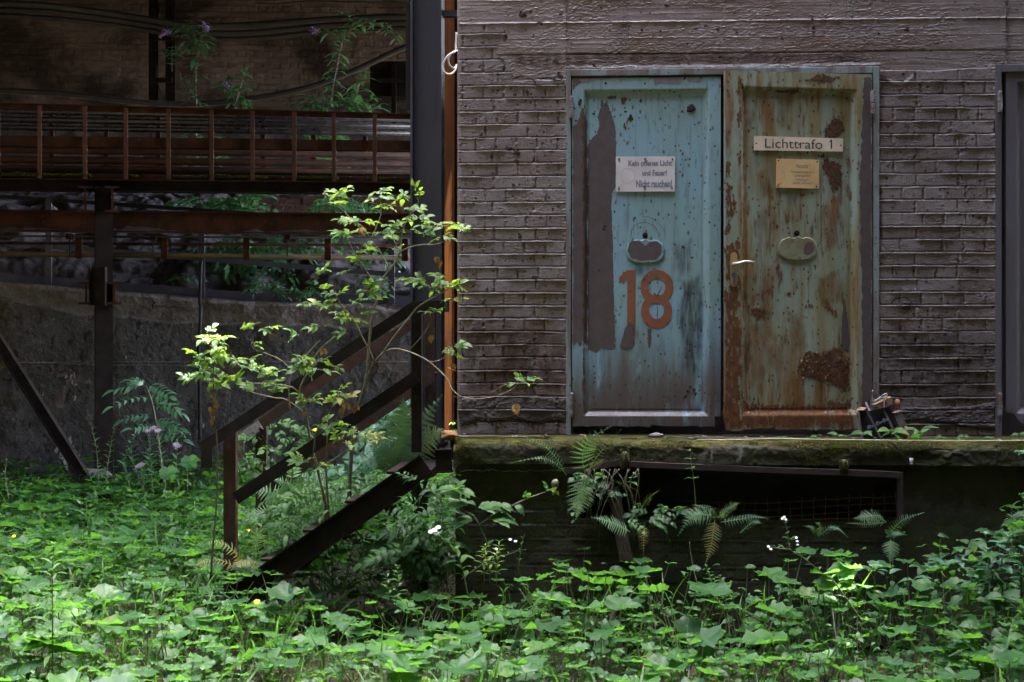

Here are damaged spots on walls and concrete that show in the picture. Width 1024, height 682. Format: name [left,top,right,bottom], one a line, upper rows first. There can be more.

peeling [572,100,634,353]
corrosion [722,73,855,431]